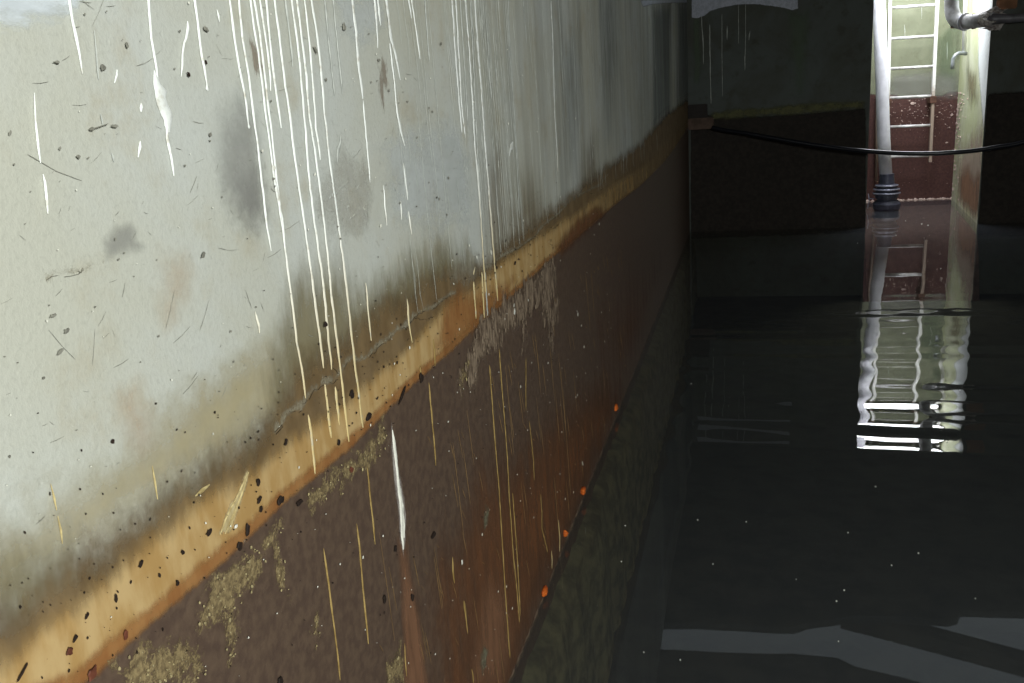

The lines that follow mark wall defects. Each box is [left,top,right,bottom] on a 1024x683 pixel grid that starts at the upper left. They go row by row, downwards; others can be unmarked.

corrosion [0,102,688,683]
crack [274,291,455,434]
leakage [84,94,879,683]